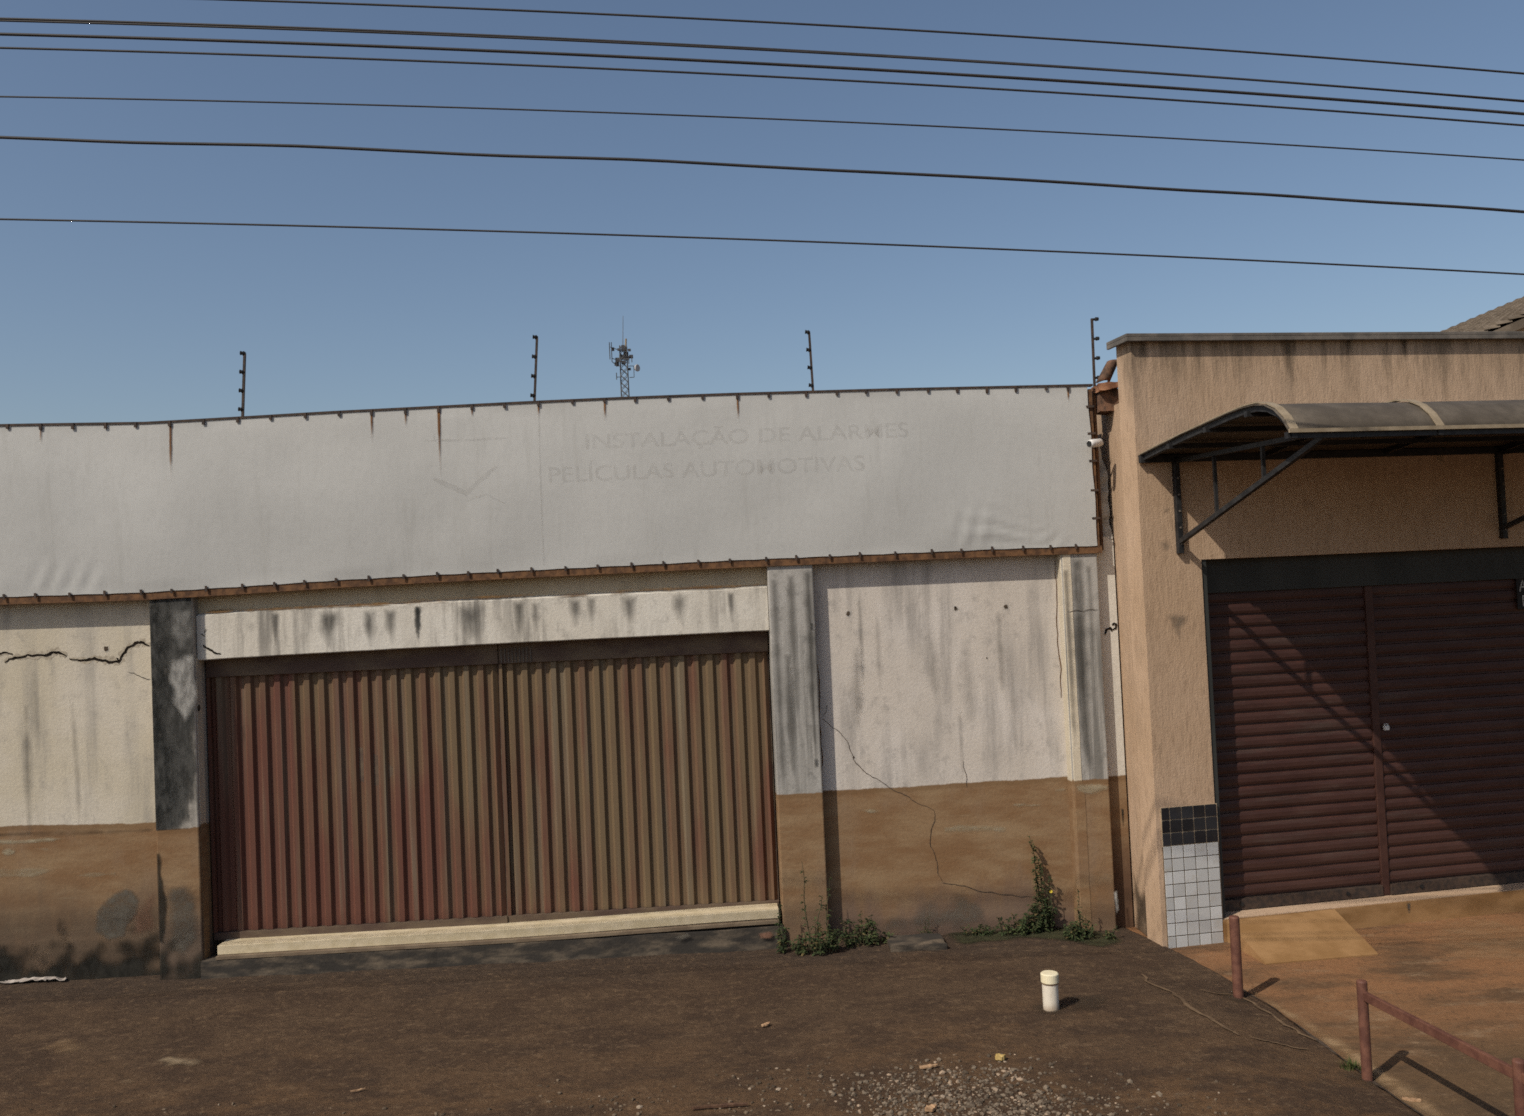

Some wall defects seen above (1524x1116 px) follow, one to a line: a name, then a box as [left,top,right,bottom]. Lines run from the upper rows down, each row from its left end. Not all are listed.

crack [0,638,150,680]
damp [149,597,197,830]
damp [789,579,813,686]
damp [1067,601,1084,689]
crack [817,664,1030,897]
damp [0,854,202,984]